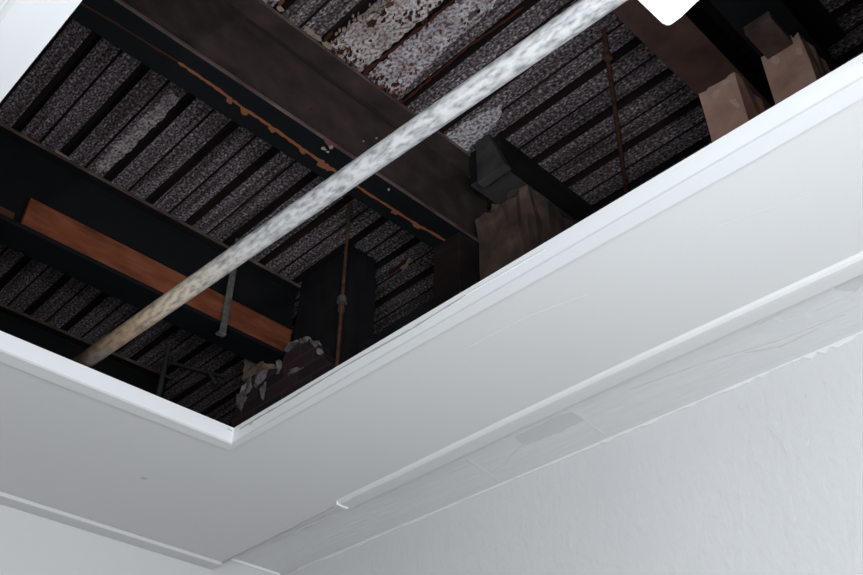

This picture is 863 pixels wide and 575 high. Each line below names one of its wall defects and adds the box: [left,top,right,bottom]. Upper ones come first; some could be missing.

peeling [305,0,496,95]
rust [324,0,524,103]
rust [356,185,445,241]
peeling [297,331,863,571]